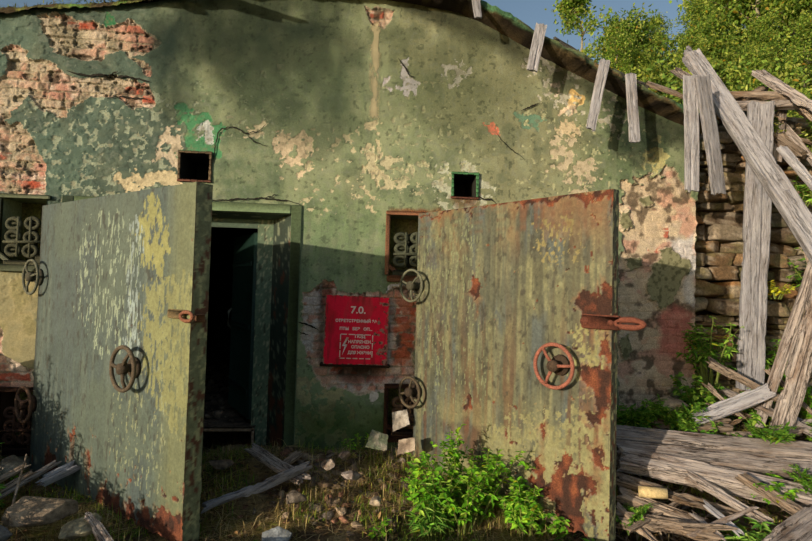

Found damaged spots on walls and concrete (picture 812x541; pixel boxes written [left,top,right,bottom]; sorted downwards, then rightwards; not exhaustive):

leakage [370,23,380,118]
crack [213,124,266,160]
peeling [272,129,314,178]
peeling [351,120,452,210]
corrosion [391,189,613,225]
spalling [0,11,227,501]
spalling [294,199,489,448]
spalling [479,135,698,541]
corrosion [572,329,612,427]
corrosion [573,280,613,315]
corrosion [89,477,184,541]
corrosion [528,448,610,541]